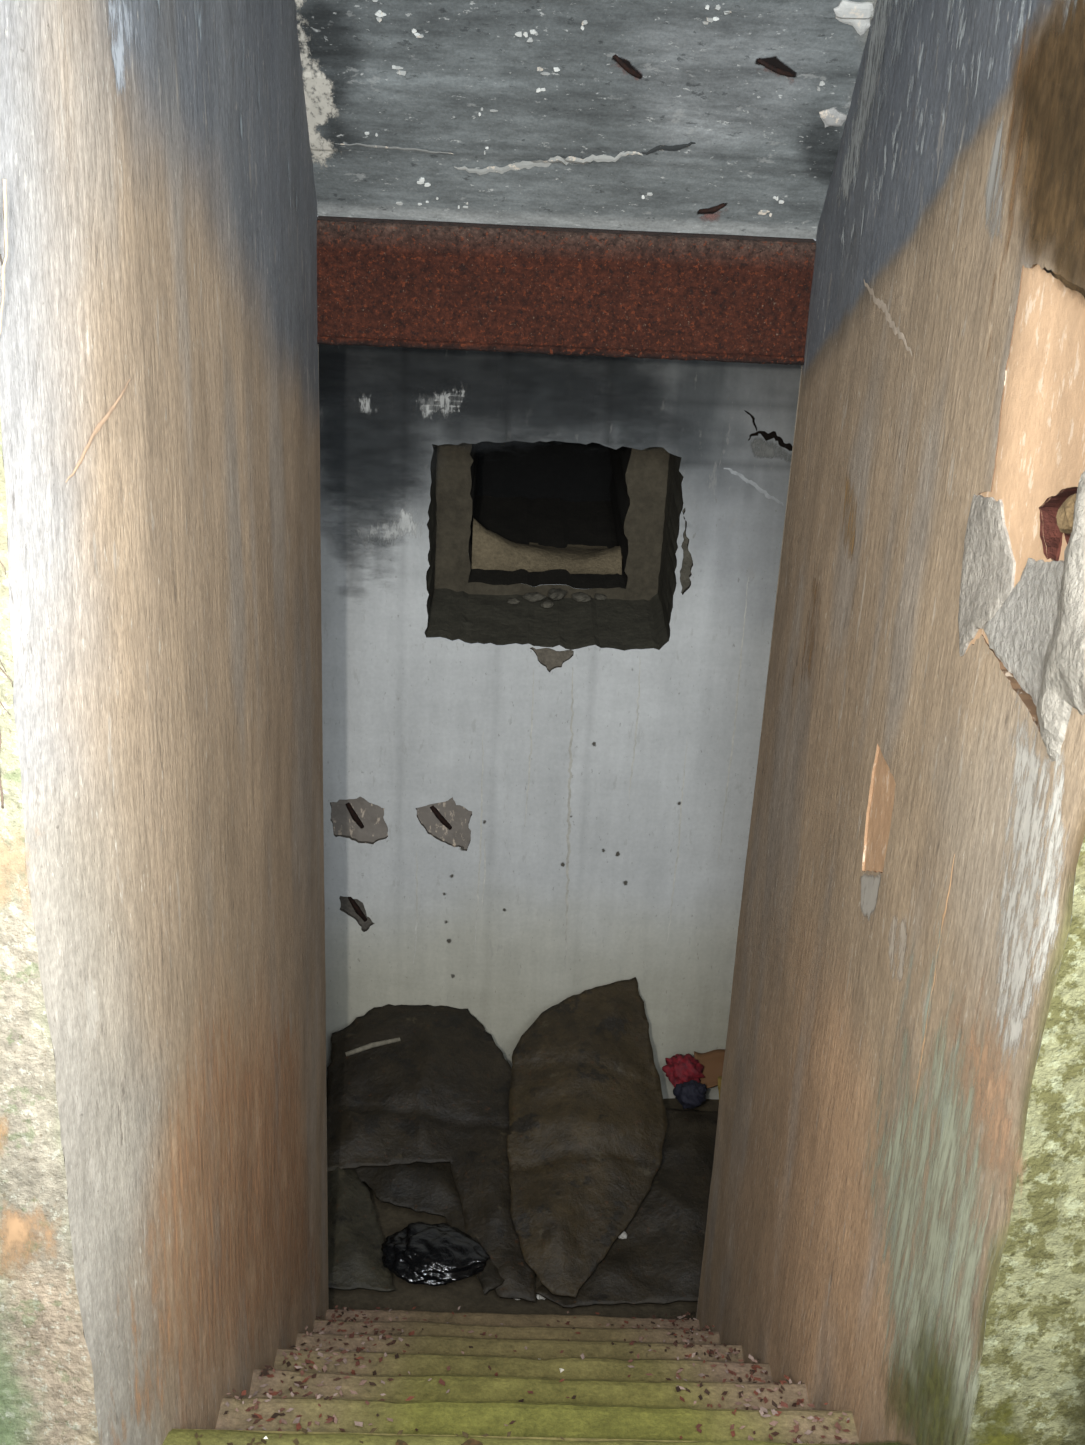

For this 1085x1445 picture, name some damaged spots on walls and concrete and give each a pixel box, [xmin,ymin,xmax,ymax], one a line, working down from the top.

peeling [295,0,338,167]
crack [744,410,793,462]
spalling [958,264,1085,762]
spalling [330,797,388,845]
spalling [416,797,486,851]
spalling [862,743,896,873]